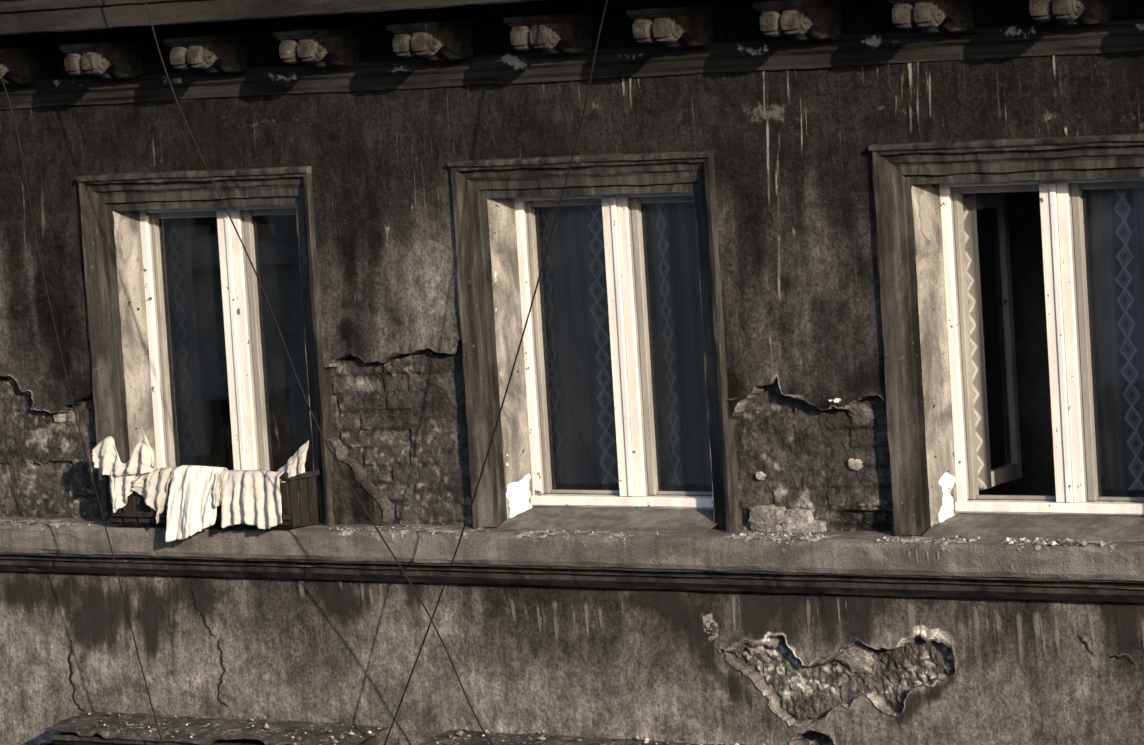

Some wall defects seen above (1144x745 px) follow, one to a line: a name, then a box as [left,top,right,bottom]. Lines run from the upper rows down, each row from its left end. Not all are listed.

leakage [495,54,527,70]
leakage [737,45,769,56]
leakage [861,34,894,47]
leakage [1000,26,1036,39]
spalling [0,374,101,519]
spalling [323,338,473,526]
spalling [727,374,894,533]
leakage [0,576,214,657]
crack [68,641,87,711]
spalling [702,612,958,745]